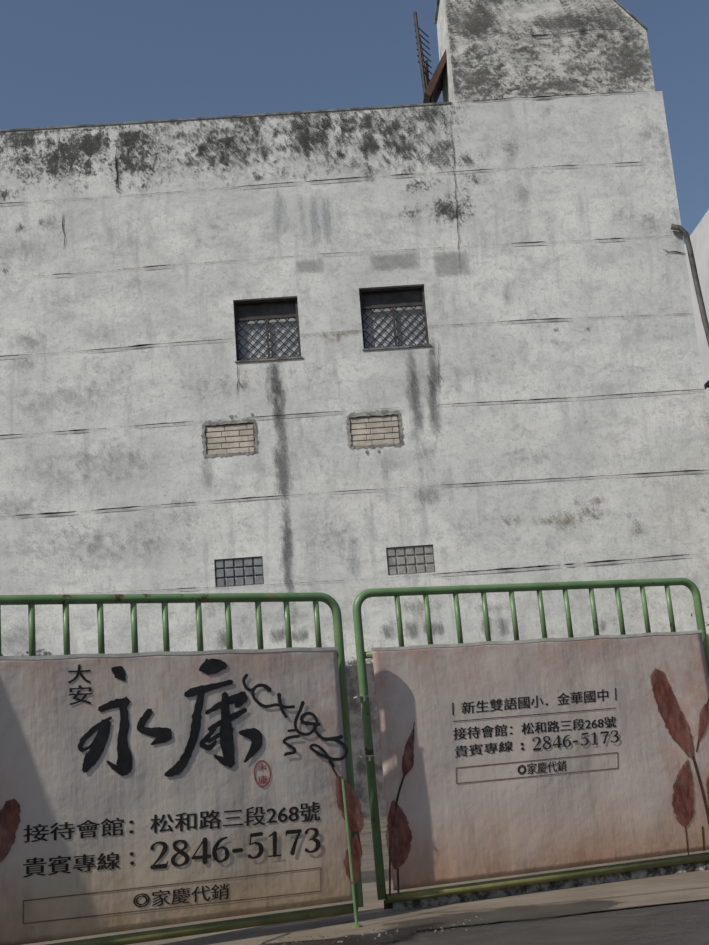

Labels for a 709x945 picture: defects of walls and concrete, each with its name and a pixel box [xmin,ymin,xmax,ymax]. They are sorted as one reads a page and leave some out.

water stain [446,0,652,102]
crack [85,149,181,199]
water stain [0,104,482,188]
water stain [406,195,473,222]
crack [233,90,656,267]
water stain [409,343,438,428]
water stain [266,364,289,494]
water stain [283,515,291,582]